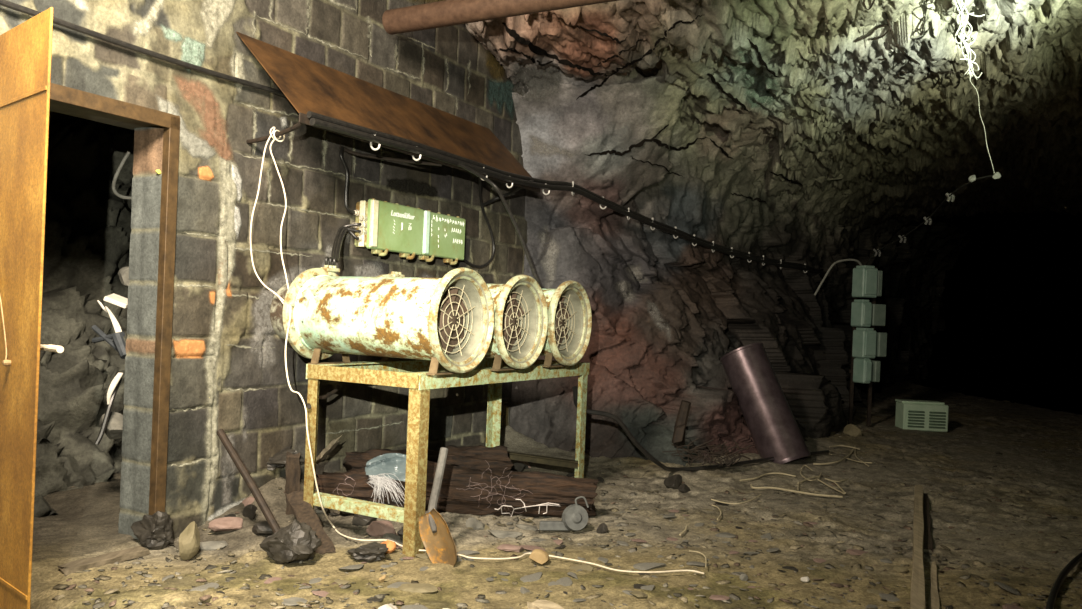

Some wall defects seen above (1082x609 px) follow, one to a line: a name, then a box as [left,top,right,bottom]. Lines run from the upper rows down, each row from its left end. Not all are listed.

crack [585,124,734,178]